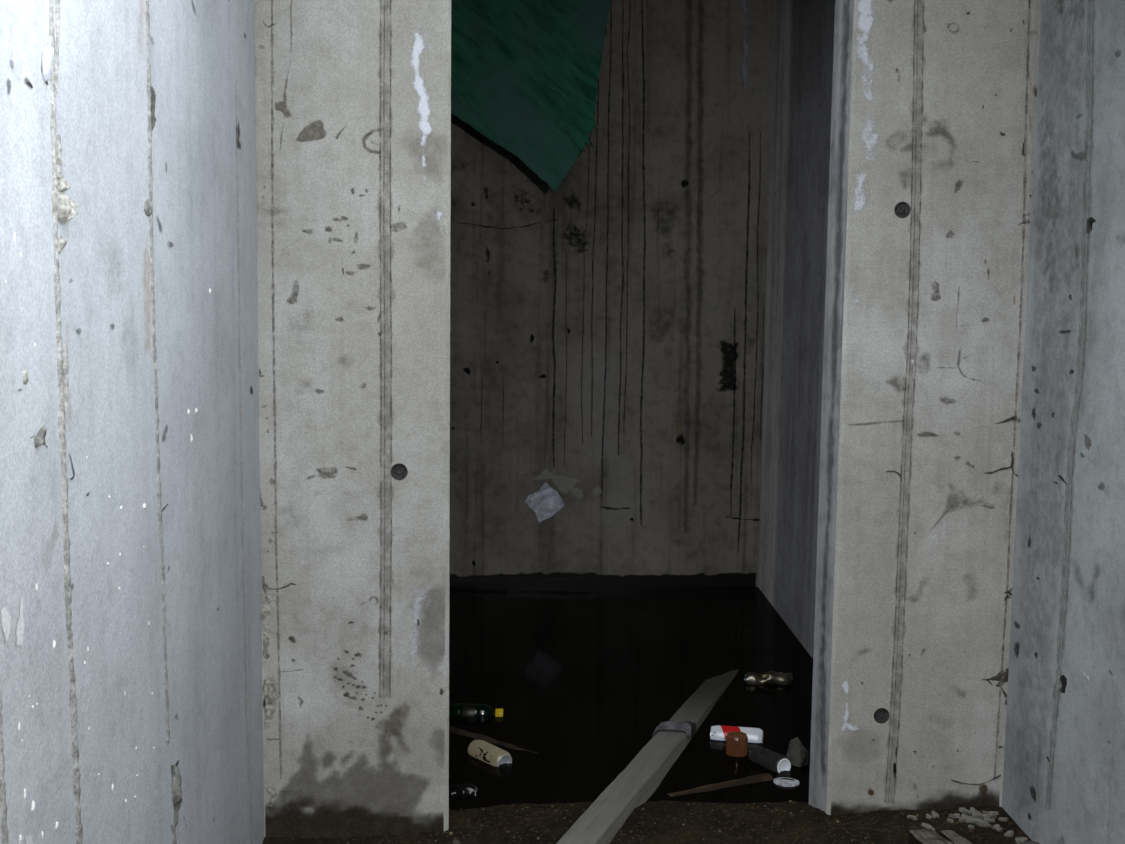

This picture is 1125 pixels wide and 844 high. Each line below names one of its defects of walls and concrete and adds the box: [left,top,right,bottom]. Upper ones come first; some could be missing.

spalling [56,156,79,254]
leakage [410,32,432,180]
leakage [832,0,874,391]
leakage [862,120,878,160]
leakage [820,419,833,772]
leakage [282,709,427,813]